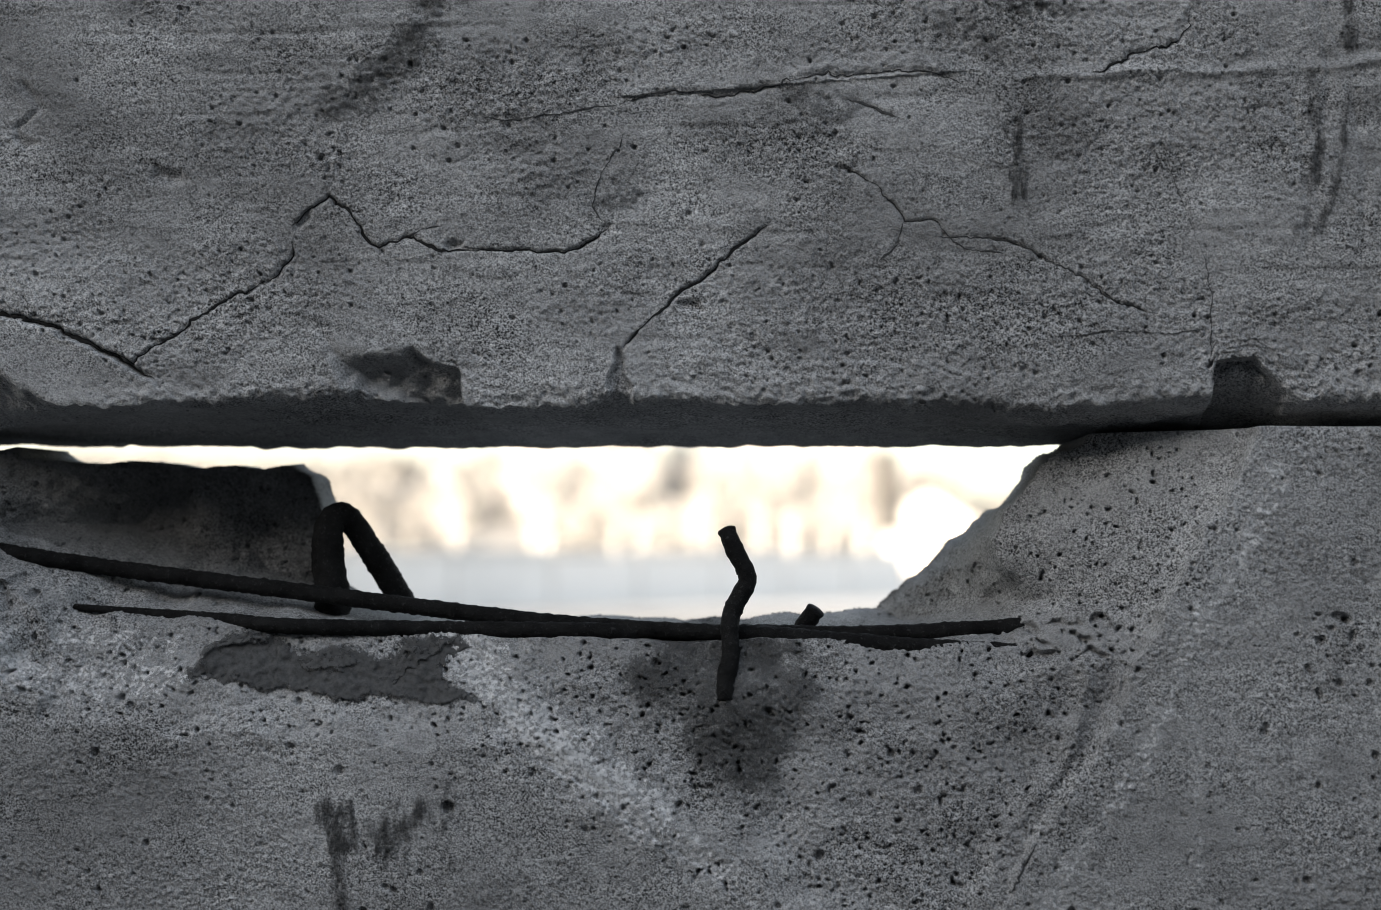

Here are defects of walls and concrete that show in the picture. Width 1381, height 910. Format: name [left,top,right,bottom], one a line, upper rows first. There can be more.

leakage [1341,0,1358,51]
leakage [1309,101,1347,230]
crack [0,69,968,377]
crack [821,161,1213,379]
spalling [0,374,98,430]
spalling [305,320,468,406]
spalling [605,342,637,405]
spalling [1209,355,1294,403]
spalling [0,427,1258,910]
leakage [315,791,454,910]
crack [1012,843,1037,891]